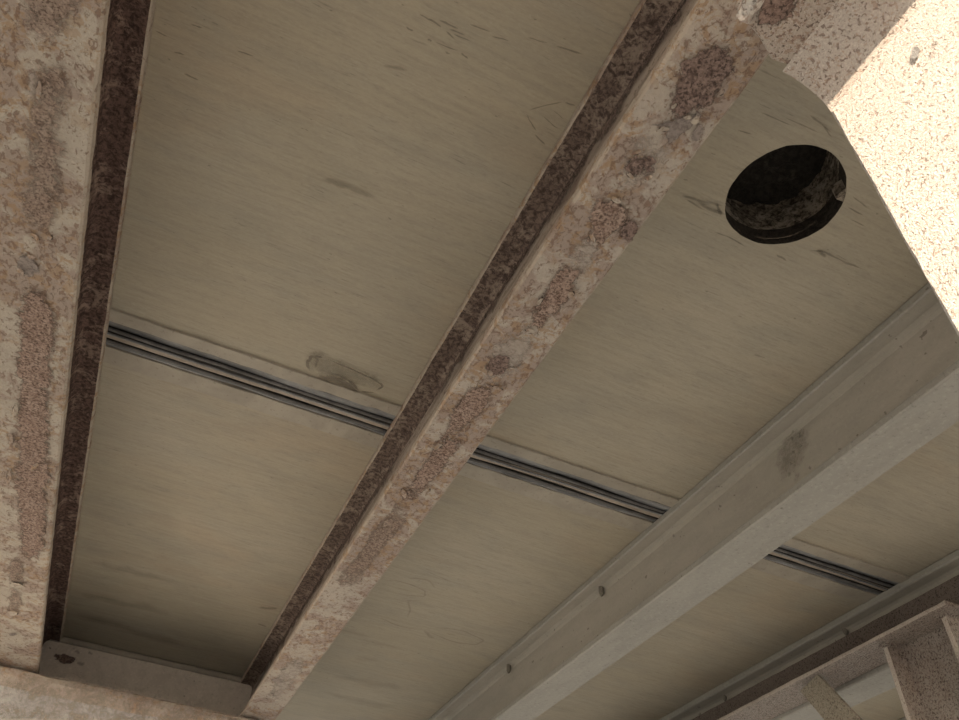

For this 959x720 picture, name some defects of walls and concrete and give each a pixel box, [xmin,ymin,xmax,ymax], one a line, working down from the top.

rust [22,67,67,241]
rust [24,0,80,36]
rust [445,0,684,383]
rust [669,44,735,120]
rust [753,0,796,29]
rust [7,287,57,616]
rust [339,355,512,585]
rust [264,470,390,670]
rust [54,654,76,664]